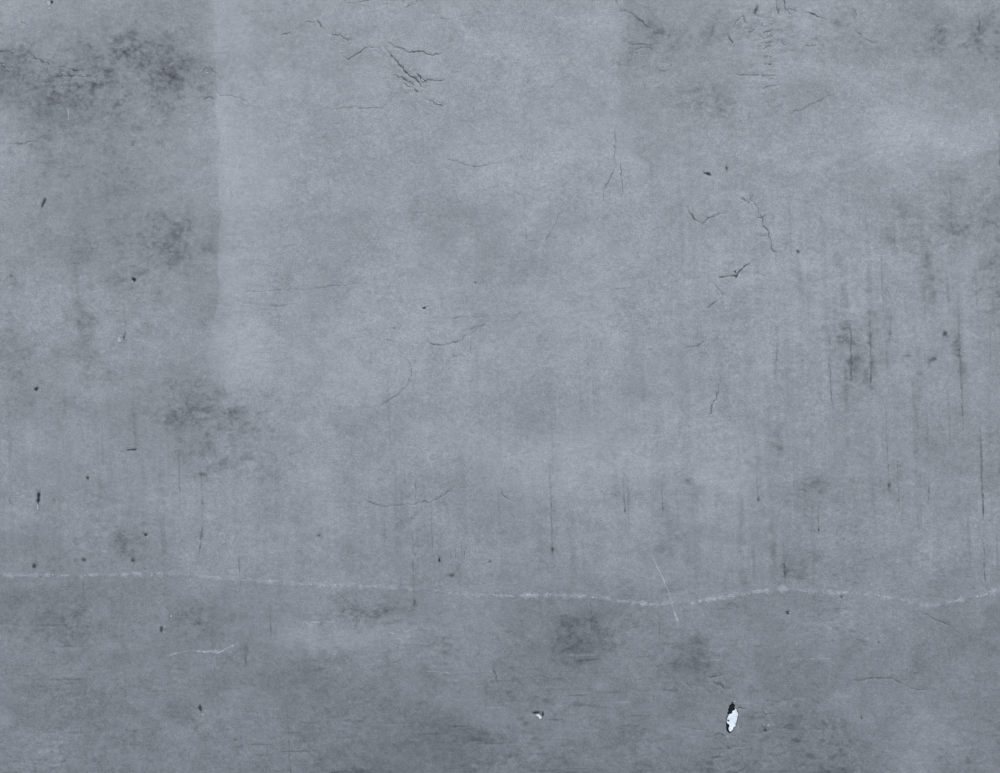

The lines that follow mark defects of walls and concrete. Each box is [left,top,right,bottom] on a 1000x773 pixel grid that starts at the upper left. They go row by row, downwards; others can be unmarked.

spalling [726,701,741,737]